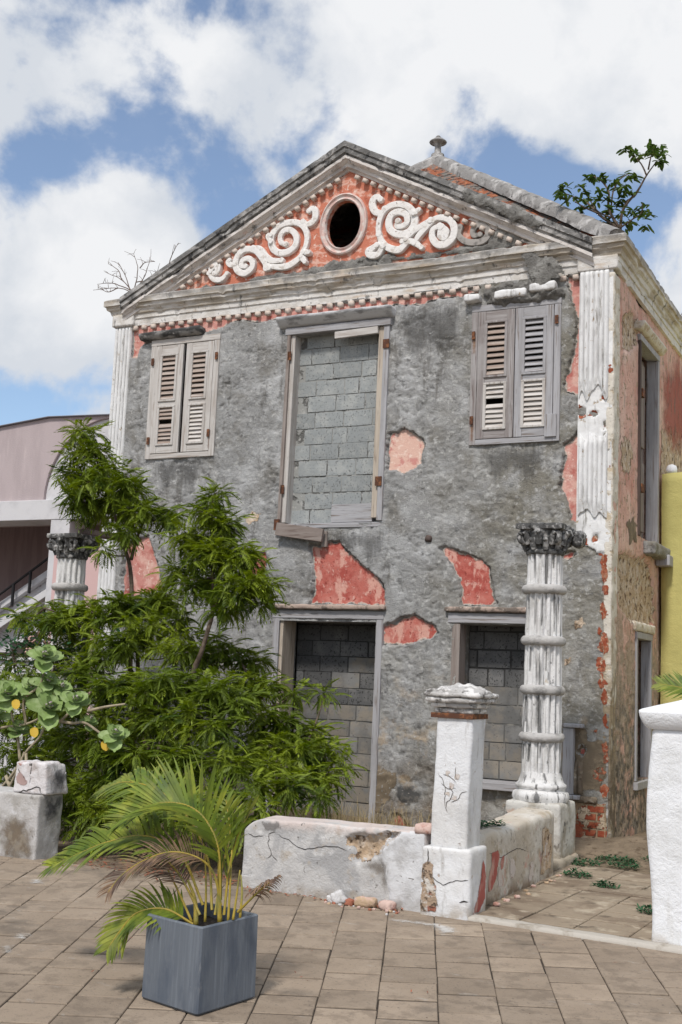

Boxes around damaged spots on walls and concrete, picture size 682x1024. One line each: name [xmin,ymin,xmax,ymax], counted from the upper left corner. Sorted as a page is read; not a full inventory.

peeling [388,429,425,474]
peeling [124,536,162,596]
peeling [311,541,386,605]
peeling [443,547,498,606]
peeling [384,615,438,645]
spalling [561,436,655,838]
crack [248,832,344,859]
spalling [346,769,421,862]
spalling [420,861,437,912]
peeling [473,851,505,915]